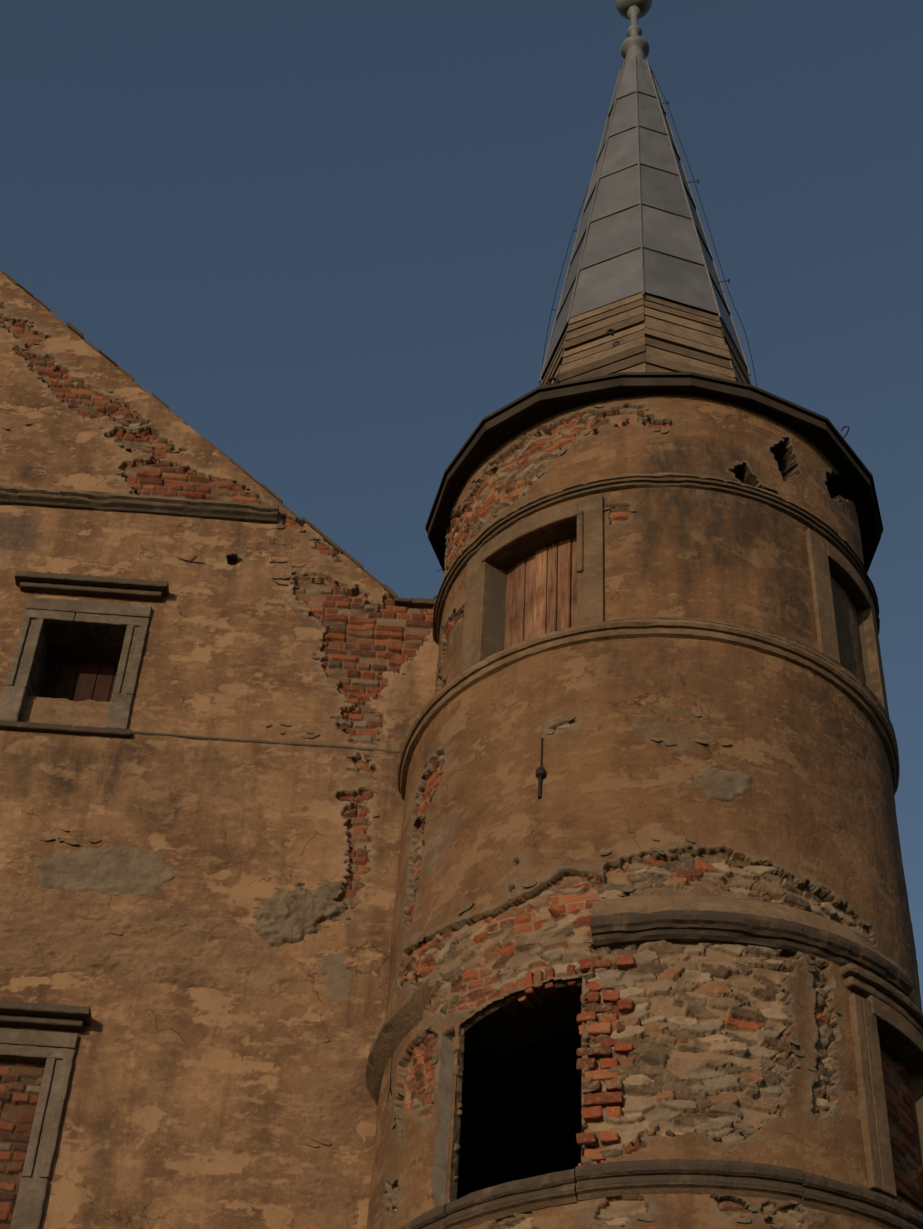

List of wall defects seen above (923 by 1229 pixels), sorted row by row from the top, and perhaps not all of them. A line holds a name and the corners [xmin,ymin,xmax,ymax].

spalling [3,317,260,505]
spalling [445,404,671,571]
spalling [264,558,464,774]
spalling [337,790,379,920]
spalling [391,837,871,1164]
spalling [492,1213,539,1229]